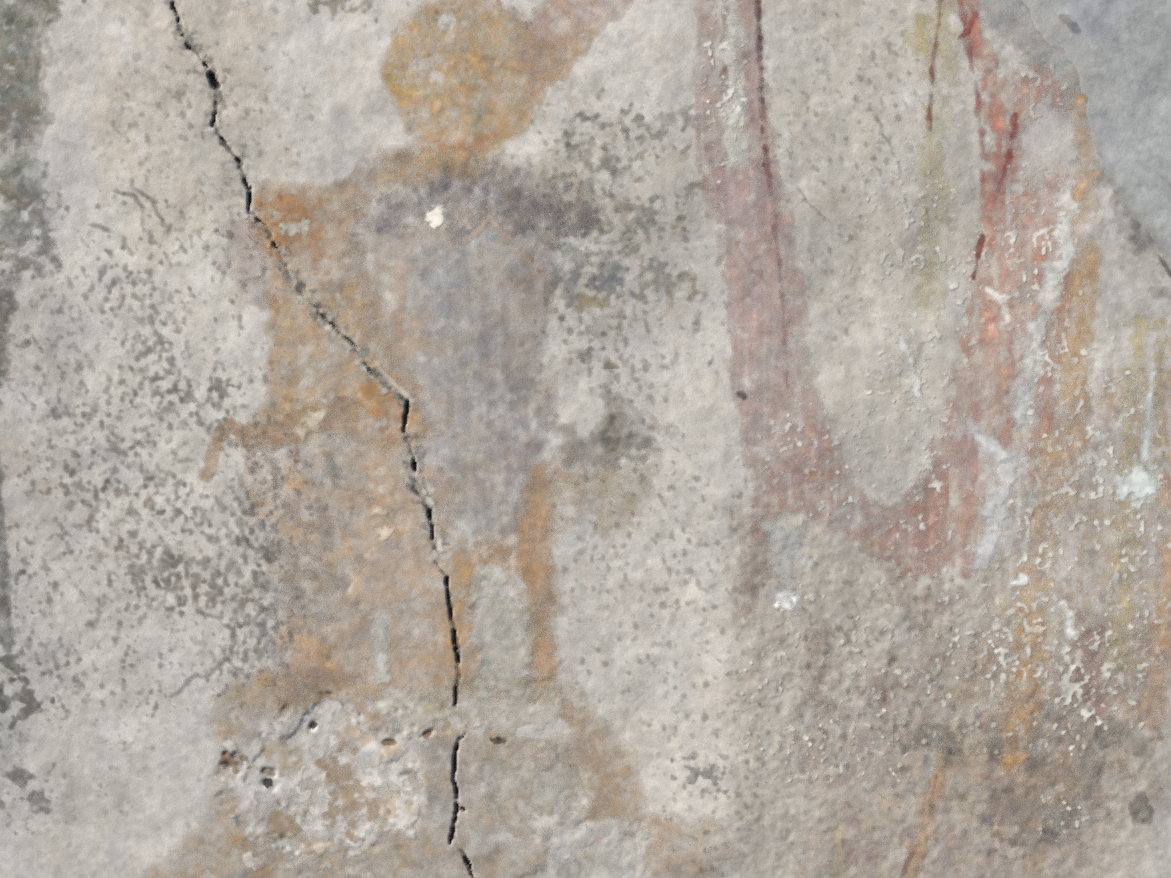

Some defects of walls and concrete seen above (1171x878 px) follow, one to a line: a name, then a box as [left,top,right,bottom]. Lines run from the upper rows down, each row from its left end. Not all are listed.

peeling [702,0,749,166]
crack [165,0,460,707]
peeling [763,170,1171,756]
crack [450,741,473,876]
peeling [740,679,864,782]
peeling [1041,795,1090,842]